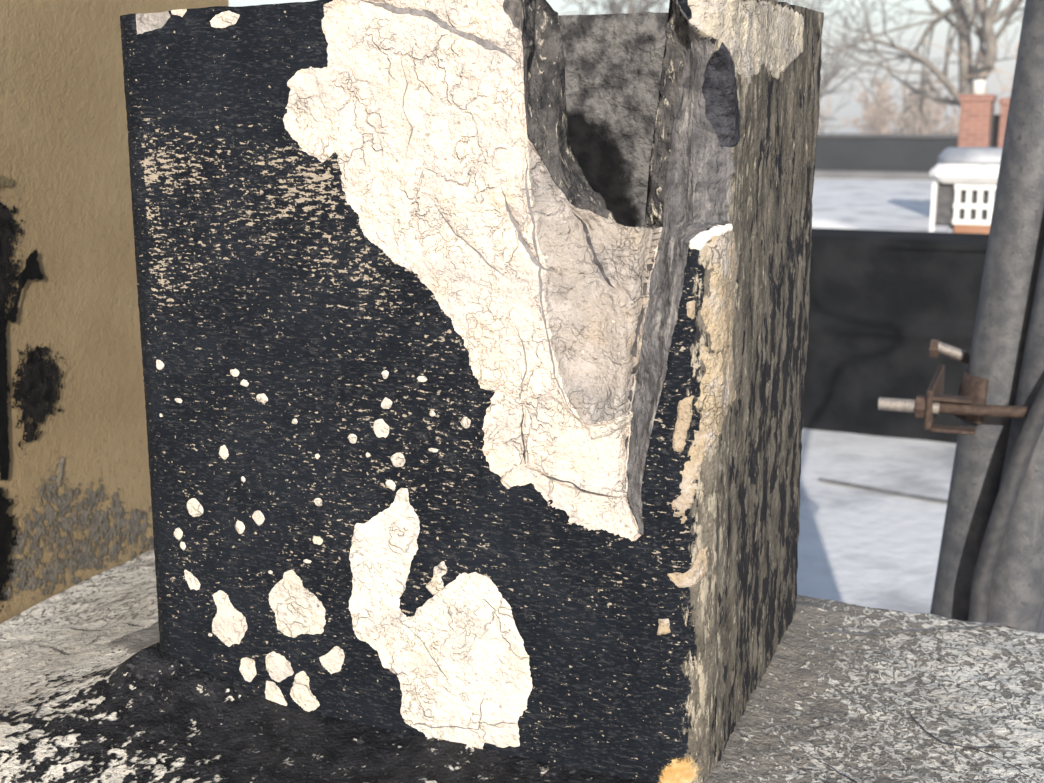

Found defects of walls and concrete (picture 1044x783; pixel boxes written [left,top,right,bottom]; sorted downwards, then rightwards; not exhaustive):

peeling [136,9,187,35]
peeling [210,11,240,28]
spalling [283,0,662,541]
peeling [672,221,739,524]
peeling [187,498,203,517]
peeling [235,510,265,534]
peeling [208,590,247,647]
peeling [268,570,326,638]
peeling [349,480,533,749]
crack [800,623,1019,635]
peeling [239,651,320,712]
peeling [319,646,345,674]